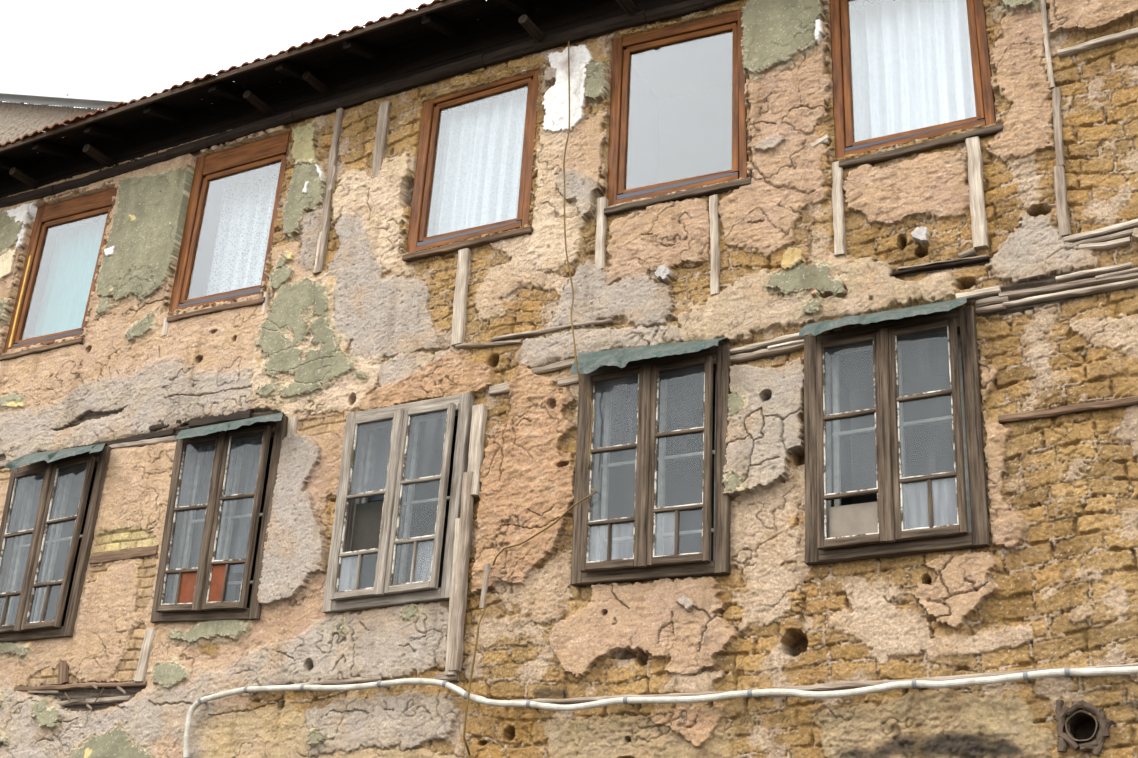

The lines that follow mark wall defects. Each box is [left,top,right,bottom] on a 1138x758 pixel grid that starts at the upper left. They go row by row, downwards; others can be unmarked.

spalling [766,37,1138,313]
spalling [604,195,659,286]
spalling [647,192,724,296]
spalling [405,231,574,368]
spalling [472,388,512,458]
crack [727,406,804,483]
spalling [779,288,1138,686]
flaking render [89,525,159,681]
spalling [442,481,675,758]
crack [658,604,731,647]
crack [928,554,989,619]
spalling [1028,680,1138,758]